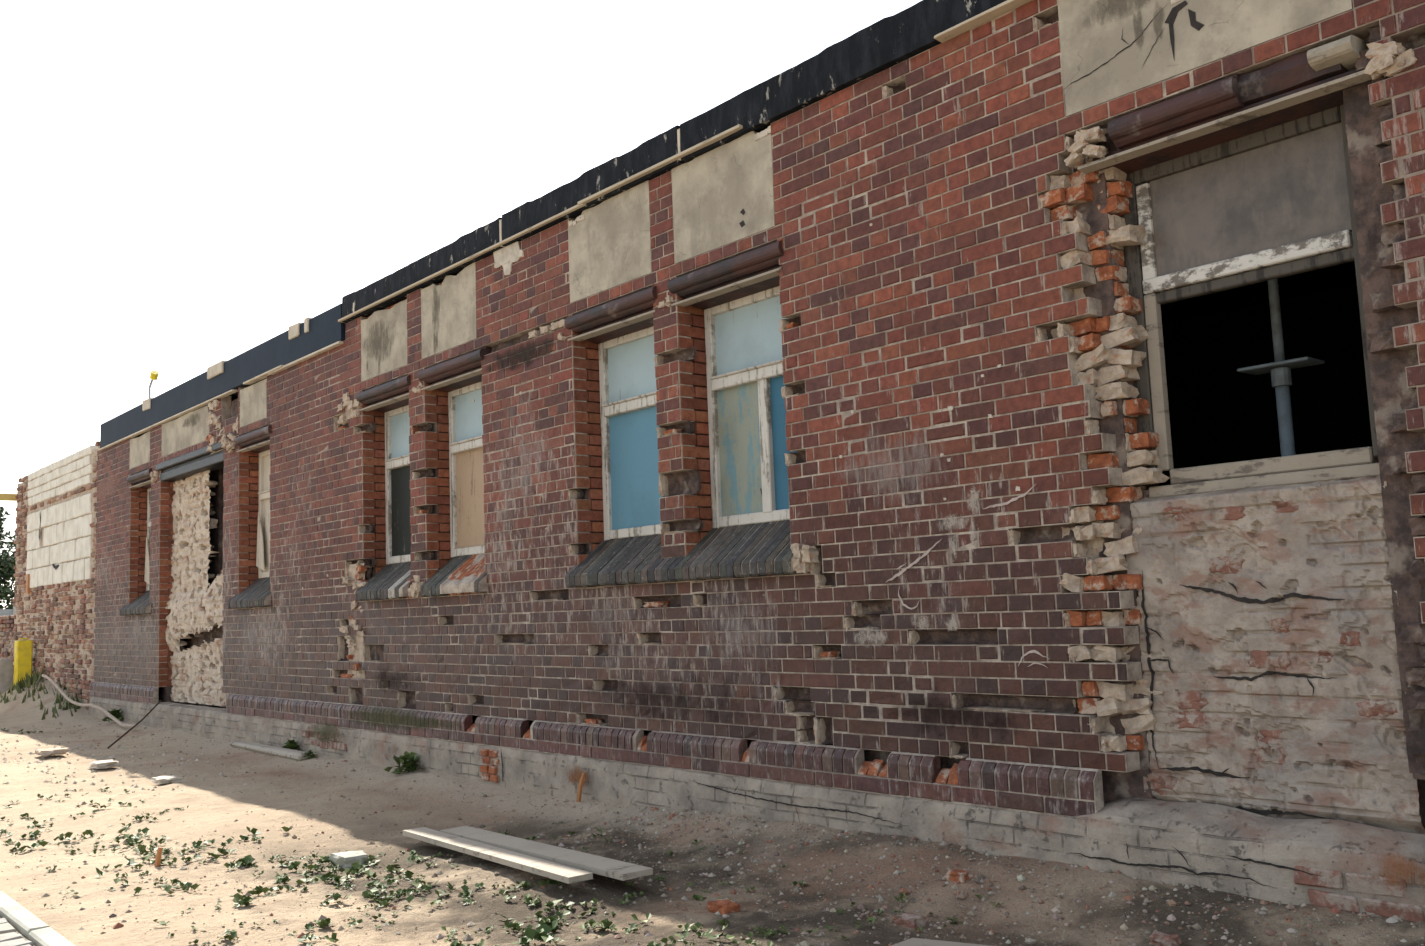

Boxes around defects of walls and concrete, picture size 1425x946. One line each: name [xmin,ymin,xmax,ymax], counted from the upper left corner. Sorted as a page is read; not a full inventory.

crack [1068,14,1165,86]
spalling [1363,33,1425,80]
spalling [1038,126,1133,222]
spalling [1035,231,1143,354]
spalling [1087,379,1159,470]
spalling [1008,524,1078,546]
spalling [1095,487,1143,521]
peeling [1216,506,1246,521]
peeling [1272,499,1301,513]
spalling [326,558,384,704]
spalling [773,686,833,745]
peeling [1167,690,1210,729]